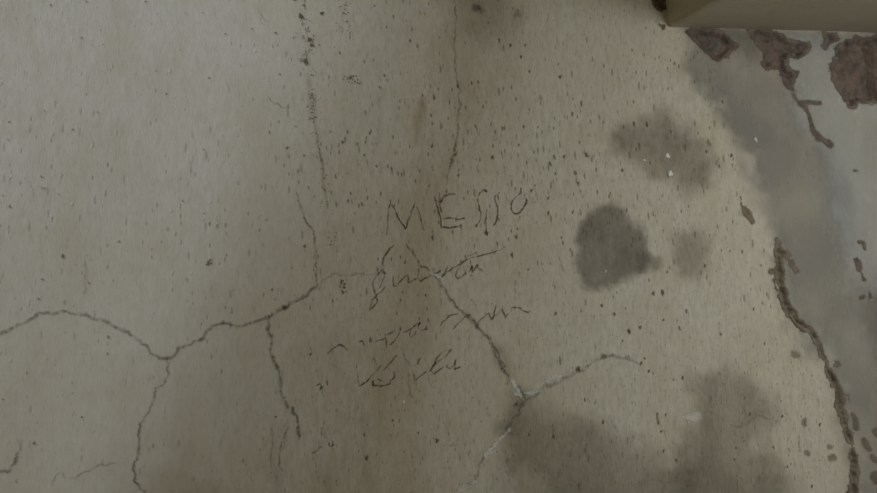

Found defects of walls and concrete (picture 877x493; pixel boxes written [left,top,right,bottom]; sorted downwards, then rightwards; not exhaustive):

crack [293,0,324,76]
flaking render [685,27,739,62]
flaking render [747,29,877,110]
flaking render [854,240,866,281]
crack [492,345,578,397]